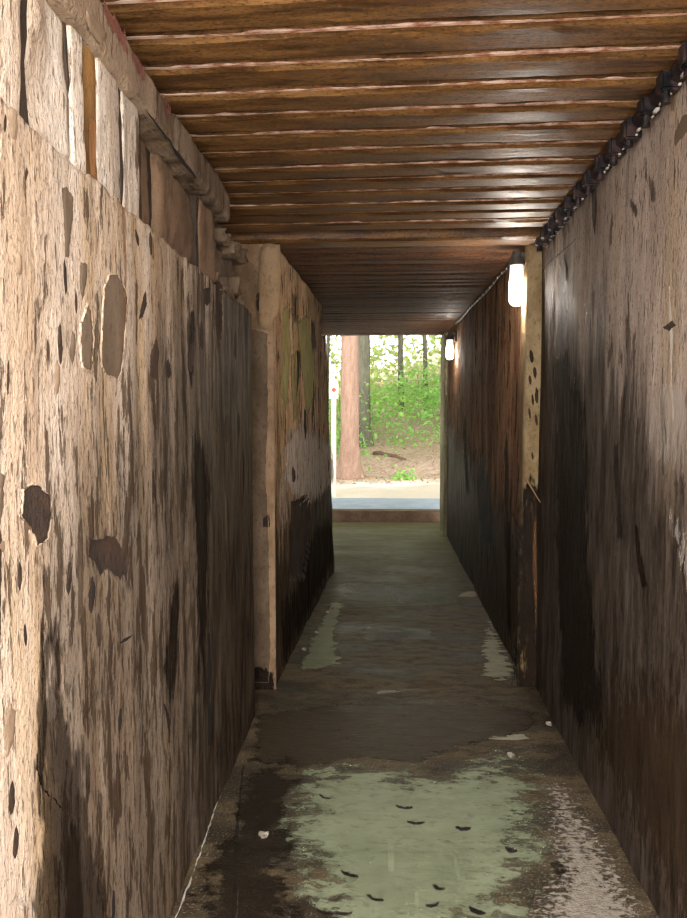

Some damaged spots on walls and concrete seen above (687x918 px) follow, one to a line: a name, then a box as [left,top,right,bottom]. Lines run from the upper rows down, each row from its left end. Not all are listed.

peeling [0,361,10,447]
peeling [46,186,152,395]
spalling [150,338,171,382]
damp [187,311,195,388]
peeling [19,482,53,548]
spalling [88,536,128,647]
damp [164,581,179,701]
damp [194,432,210,674]
damp [553,349,687,918]
peeling [3,697,16,757]
damp [17,614,107,918]
damp [175,702,547,918]